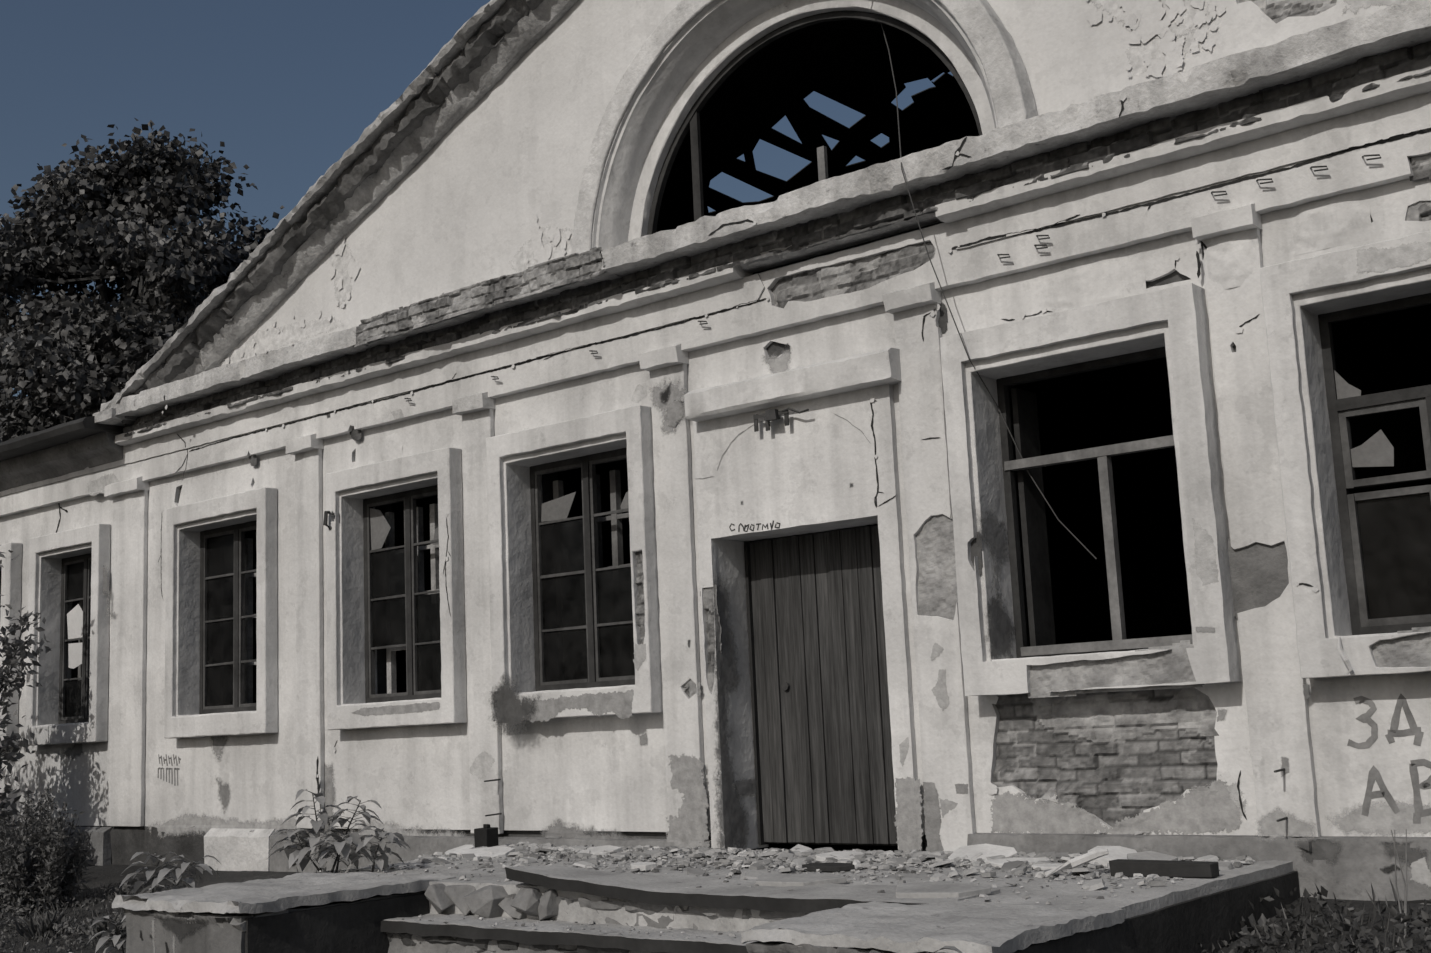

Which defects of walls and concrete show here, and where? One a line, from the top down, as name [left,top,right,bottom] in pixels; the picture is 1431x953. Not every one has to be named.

peeling [1086,0,1411,78]
spalling [123,41,1431,437]
crack [835,397,896,508]
spalling [633,551,651,671]
spalling [916,515,982,620]
spalling [1192,518,1289,619]
peeling [522,689,634,723]
spalling [987,640,1247,835]
peeling [663,753,710,849]